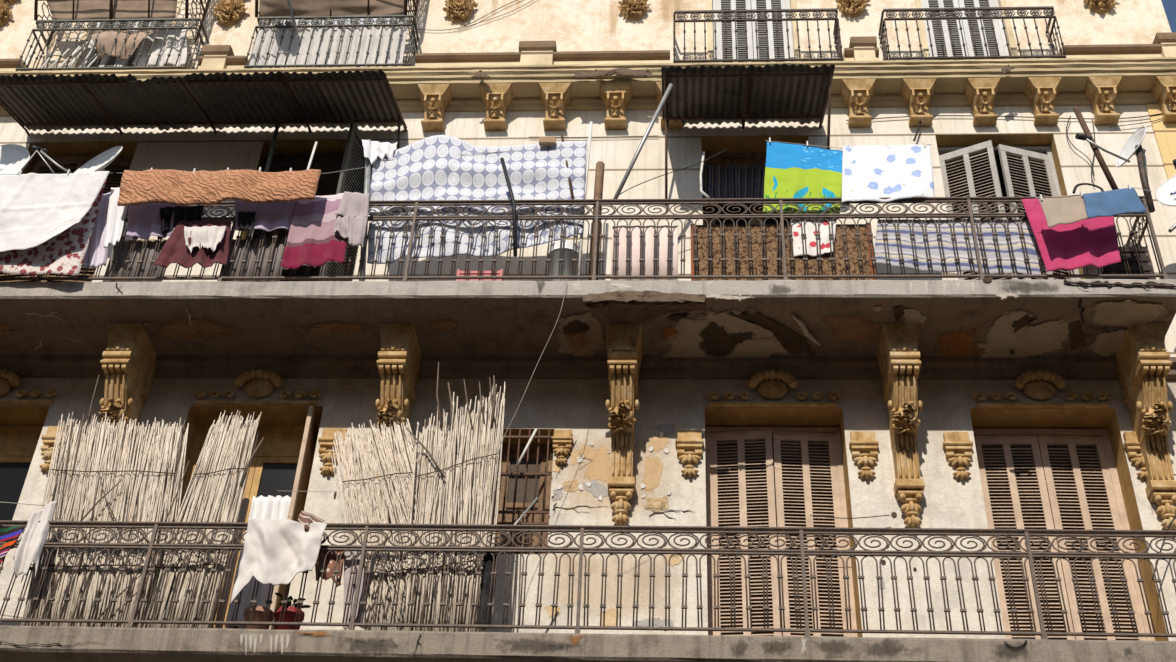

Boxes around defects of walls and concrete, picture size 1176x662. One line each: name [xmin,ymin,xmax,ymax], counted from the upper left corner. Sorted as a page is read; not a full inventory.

peeling [555,290,815,358]
peeling [977,277,1168,358]
peeling [552,442,611,501]
peeling [640,424,675,512]